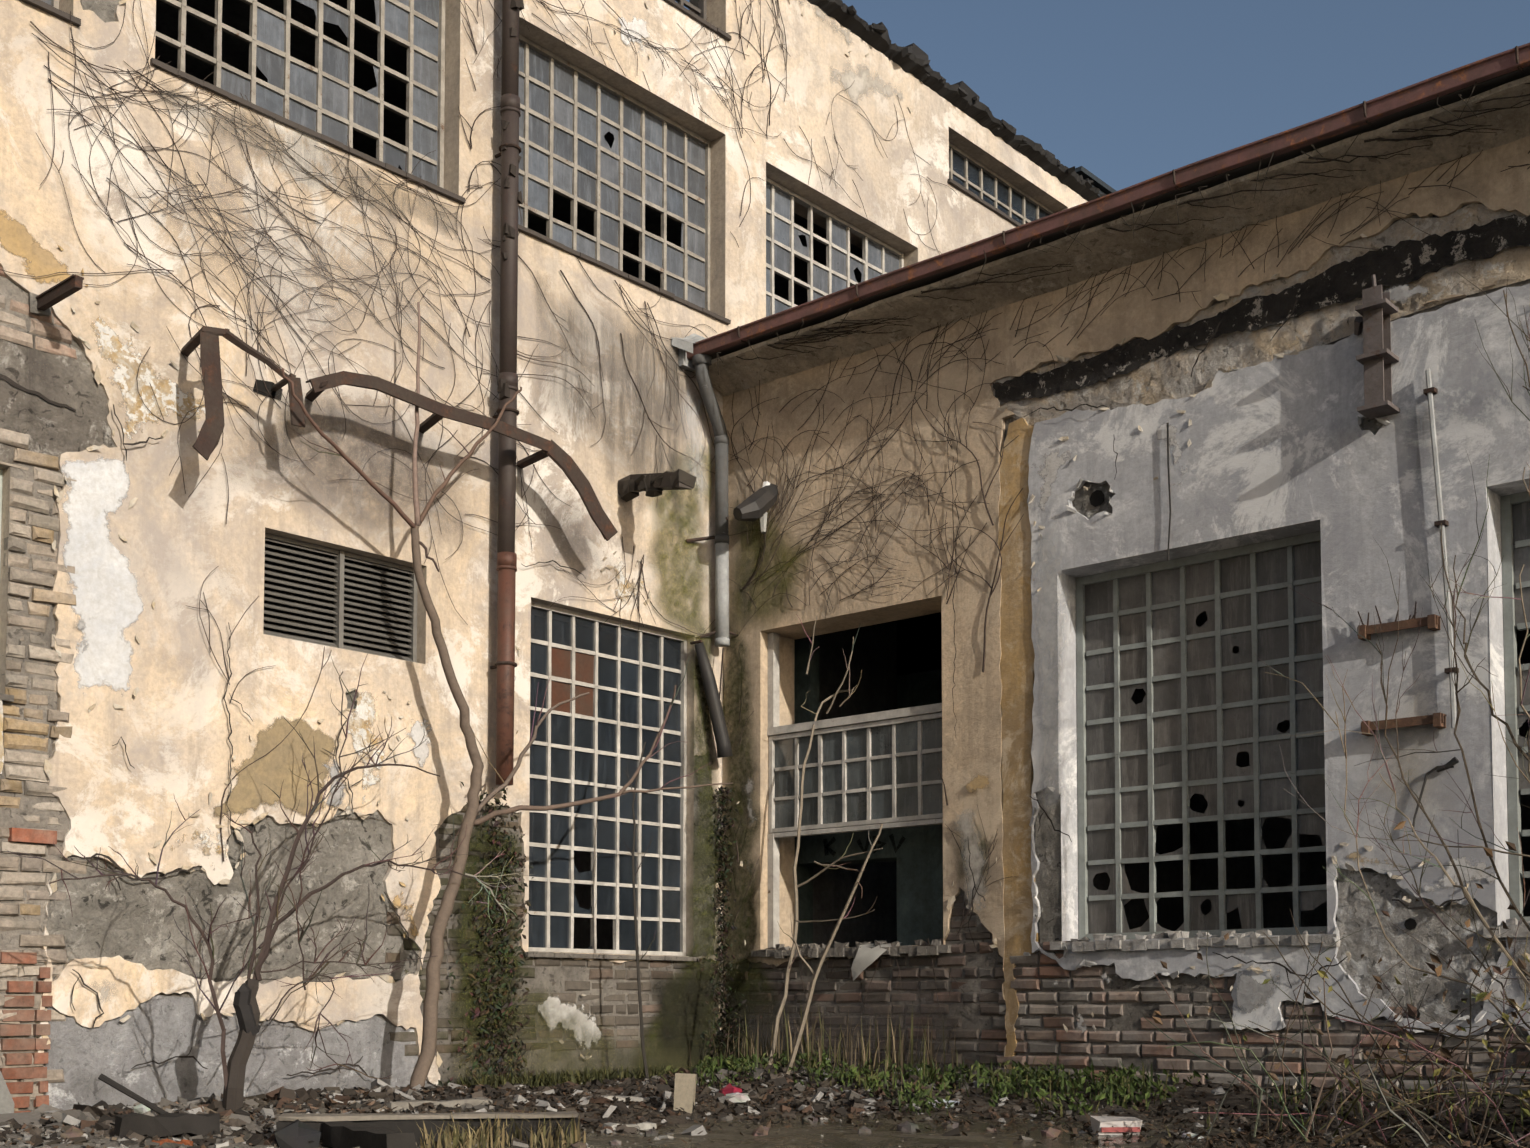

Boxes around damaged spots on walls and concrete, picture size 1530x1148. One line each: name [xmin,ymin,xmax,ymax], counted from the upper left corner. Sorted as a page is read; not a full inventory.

flaking render [81,0,127,23]
flaking render [0,203,1530,1113]